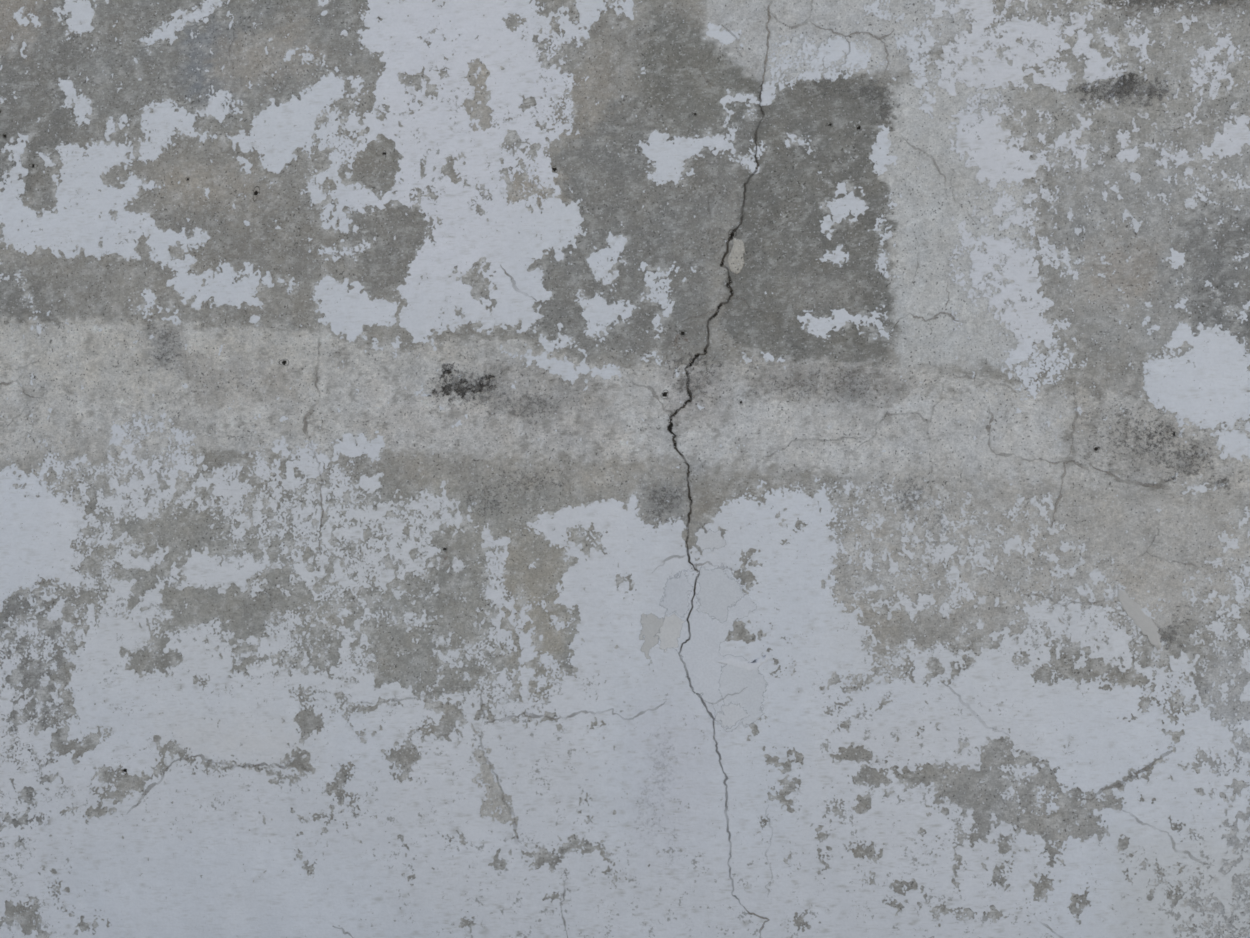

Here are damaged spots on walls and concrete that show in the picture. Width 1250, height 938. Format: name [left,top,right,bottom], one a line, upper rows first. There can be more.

crack [811,22,892,52]
peeling [460,58,513,136]
crack [667,5,771,651]
peeling [0,854,110,938]
peeling [83,684,324,825]
peeling [290,761,361,878]
peeling [472,742,627,889]
crack [701,698,723,770]
crack [744,907,769,931]
peeling [757,746,804,834]
peeling [815,728,1168,909]
peeling [1122,779,1250,938]